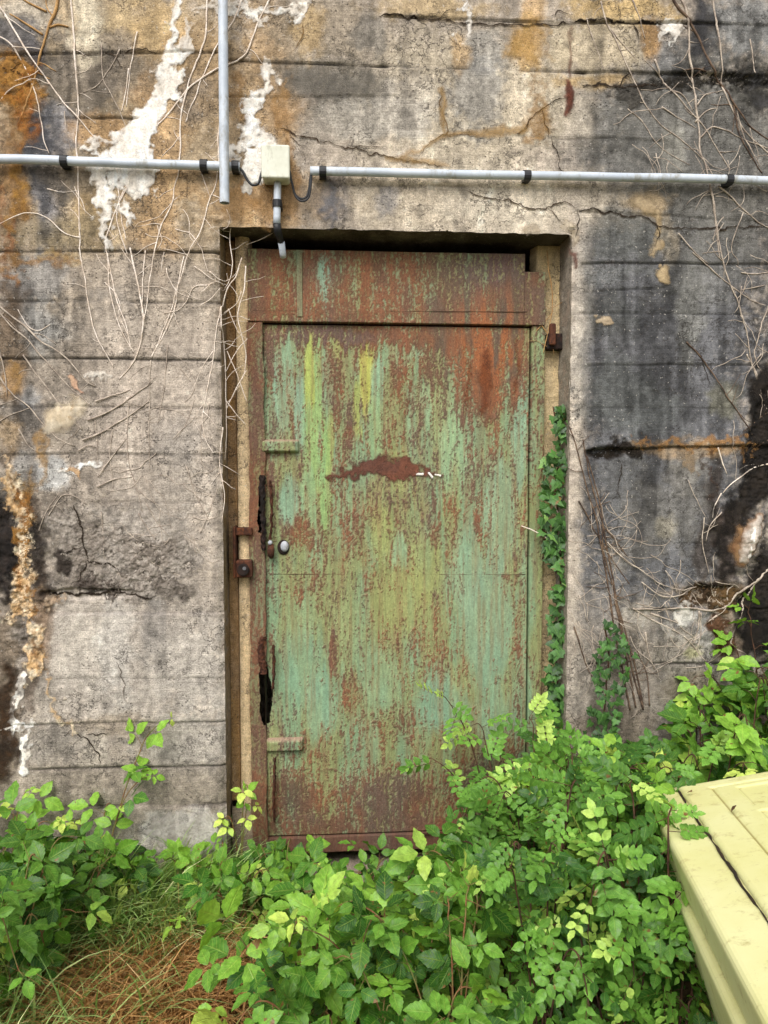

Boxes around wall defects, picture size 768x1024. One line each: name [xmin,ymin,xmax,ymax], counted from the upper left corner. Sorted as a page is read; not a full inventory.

crack [379,8,658,40]
efflorescence [80,0,194,251]
leakage [218,56,313,194]
crack [280,94,475,167]
rust [564,79,574,116]
crack [468,191,767,246]
rust [325,454,443,482]
leakage [710,365,768,581]
rust [258,475,274,551]
crack [50,505,154,600]
leakage [734,553,768,655]
rust [256,636,276,689]